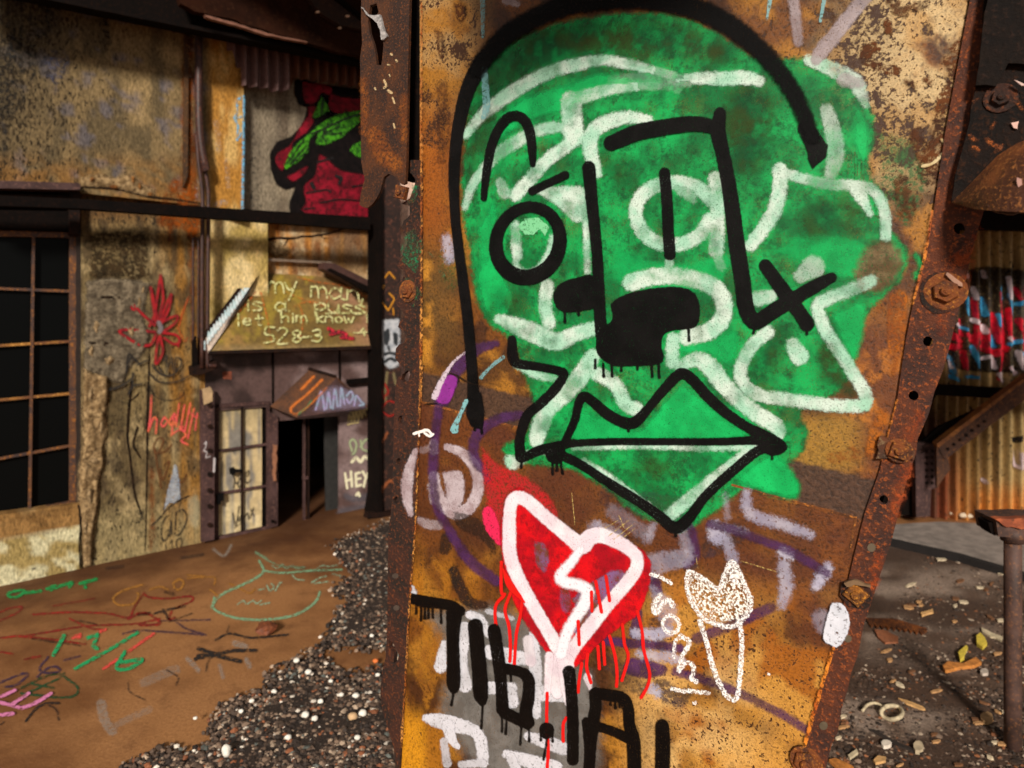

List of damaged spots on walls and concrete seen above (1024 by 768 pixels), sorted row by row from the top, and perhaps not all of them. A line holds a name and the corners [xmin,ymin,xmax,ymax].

rust [159,38,200,269]
rust [361,78,406,169]
rust [860,0,970,218]
rust [887,290,907,374]
rust [866,410,888,456]
rust [891,465,912,521]
rust [415,626,443,705]